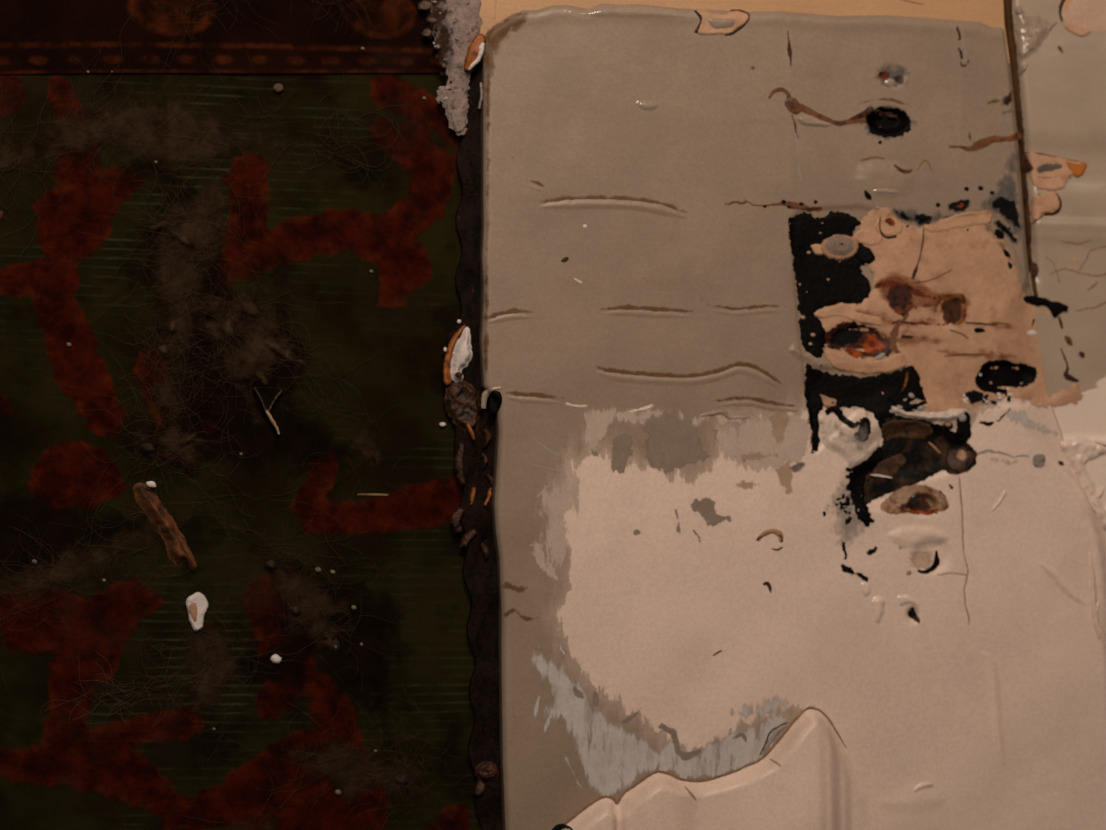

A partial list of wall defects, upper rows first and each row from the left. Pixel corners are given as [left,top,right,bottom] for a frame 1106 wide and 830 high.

peeling [694,9,750,36]
peeling [1059,0,1106,37]
crack [768,31,866,139]
peeling [1025,152,1087,225]
rust [824,277,966,360]
peeling [787,207,1084,412]
peeling [611,433,633,473]
peeling [643,413,710,475]
peeling [691,498,731,526]
rust [896,506,939,515]
peeling [756,529,783,551]
peeling [530,542,558,581]